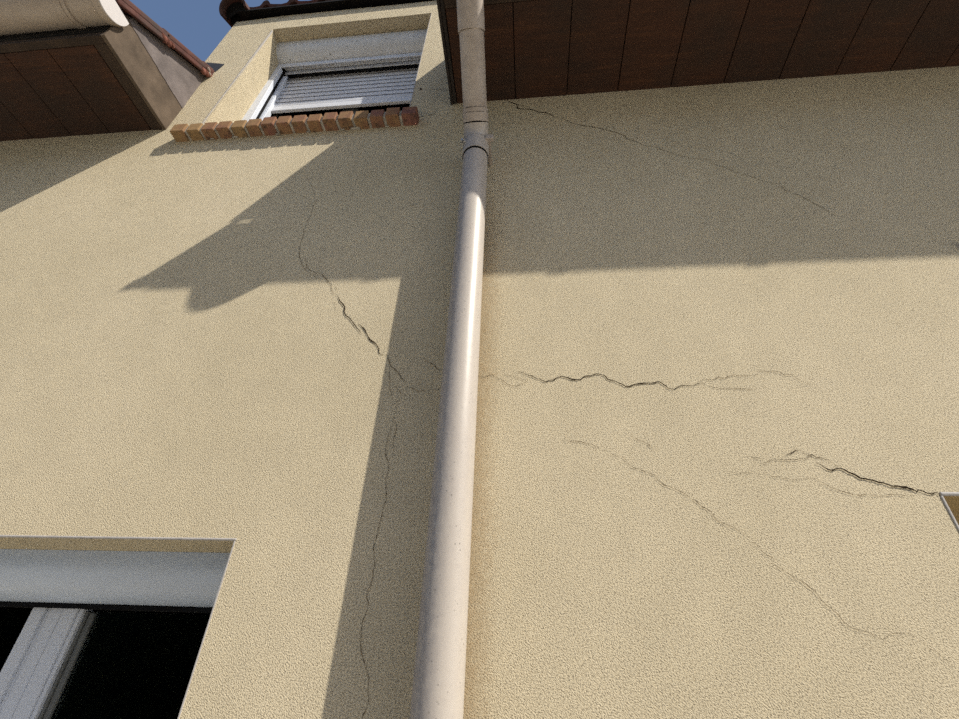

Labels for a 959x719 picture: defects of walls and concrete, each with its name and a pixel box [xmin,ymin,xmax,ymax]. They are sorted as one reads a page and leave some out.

crack [480,371,811,390]
crack [277,178,438,718]
crack [731,449,940,496]